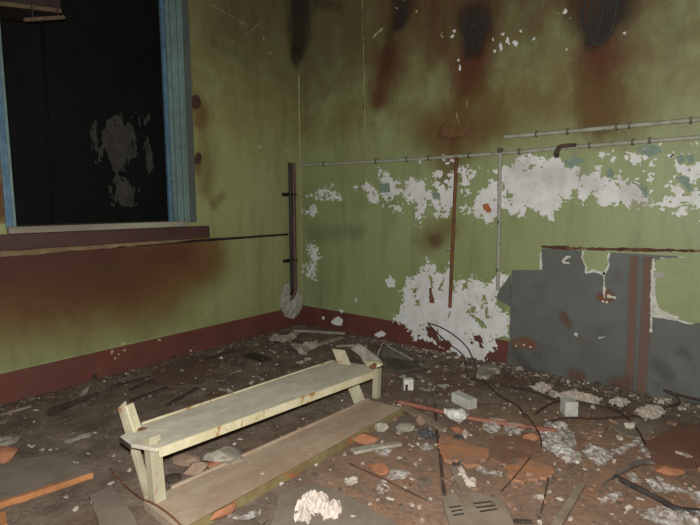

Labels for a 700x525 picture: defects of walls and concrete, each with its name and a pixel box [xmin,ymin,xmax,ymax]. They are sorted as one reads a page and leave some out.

rust [393,0,414,29]
rust [422,0,499,171]
rust [570,0,630,121]
peeling [301,183,343,217]
peeling [353,141,700,228]
rust [0,238,221,329]
peeling [302,240,322,281]
peeling [385,256,510,362]
rust [541,245,700,394]